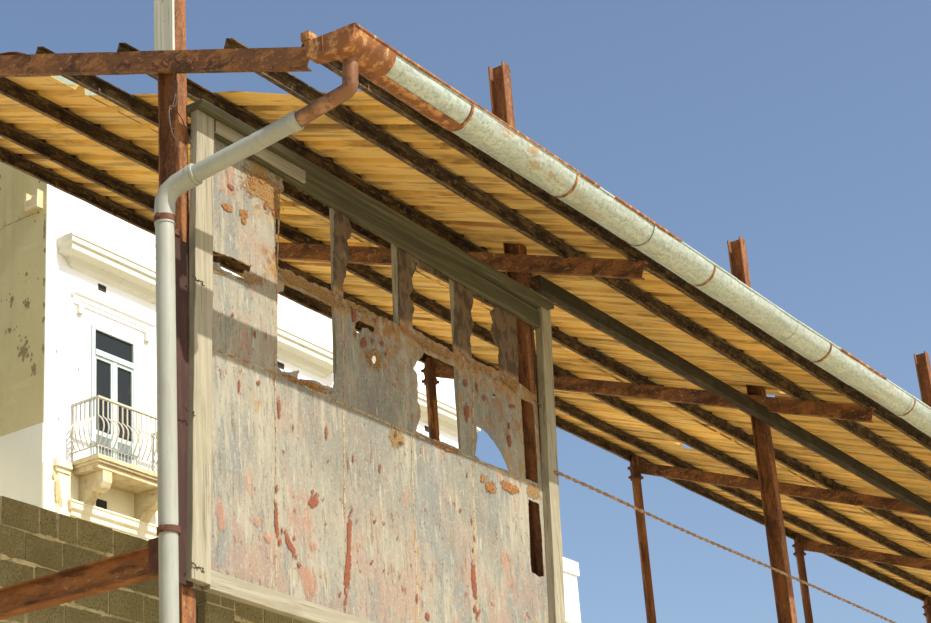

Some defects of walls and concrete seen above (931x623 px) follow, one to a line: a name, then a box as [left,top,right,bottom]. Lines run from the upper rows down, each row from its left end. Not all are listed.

rust [276,266,371,314]
rust [366,349,384,372]
rust [280,371,332,394]
rust [389,428,406,448]
peeling [309,489,324,508]
rust [481,474,541,499]
peeling [274,484,301,567]
peeling [340,505,358,610]
peeling [471,536,481,619]